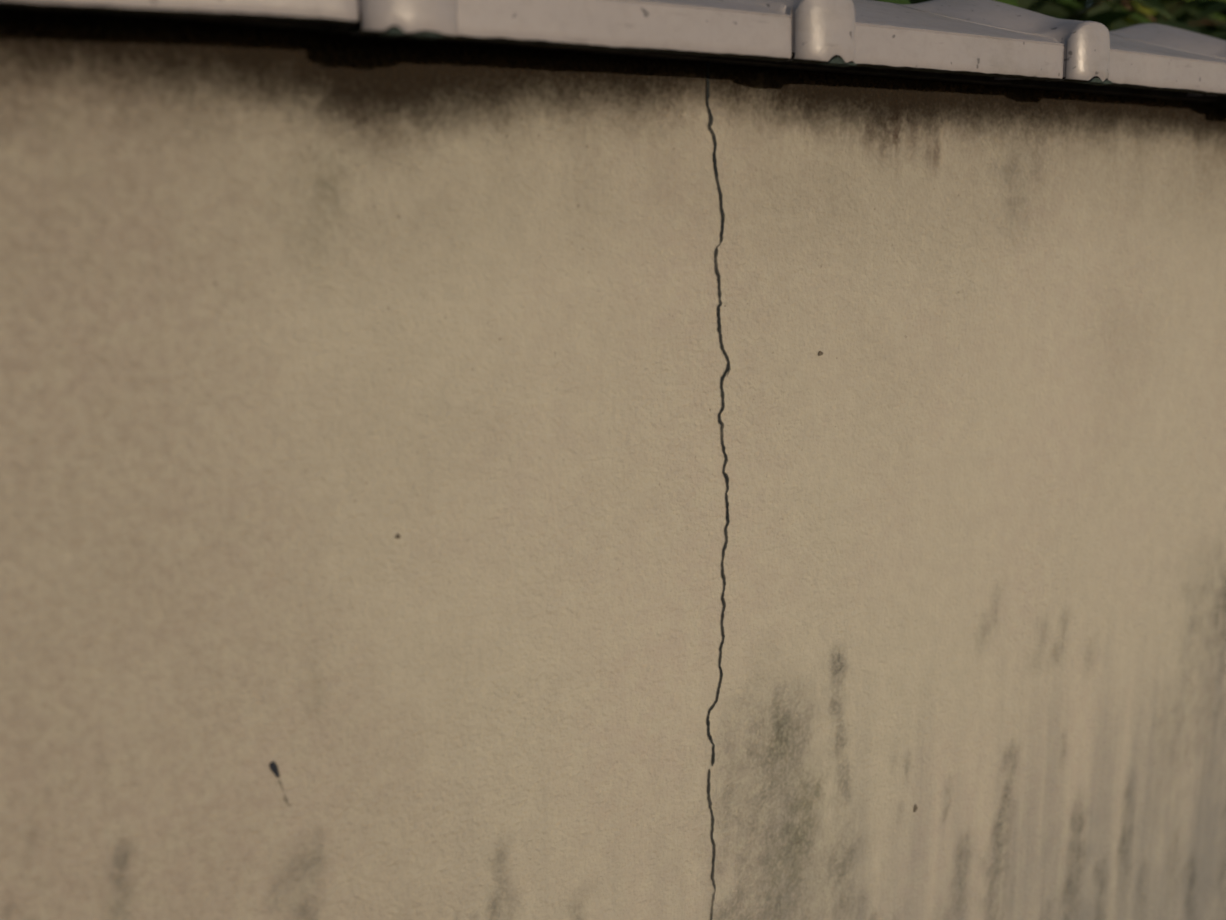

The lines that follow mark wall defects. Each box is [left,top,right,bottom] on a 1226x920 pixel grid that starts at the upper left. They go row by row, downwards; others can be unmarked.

crack [706,61,731,920]